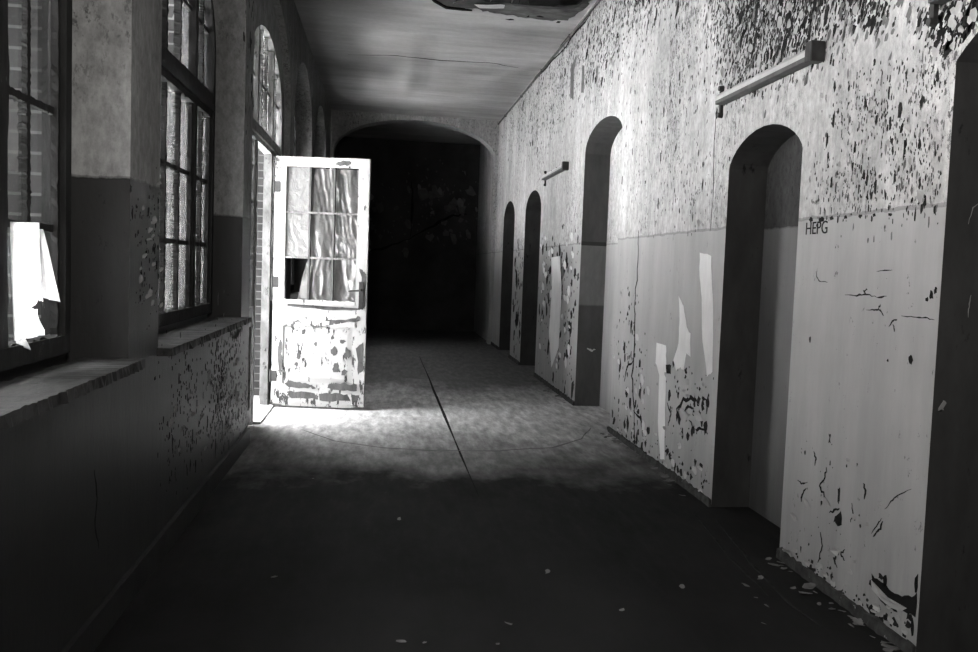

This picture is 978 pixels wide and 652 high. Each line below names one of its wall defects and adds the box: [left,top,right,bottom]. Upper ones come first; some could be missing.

peeling [432,0,978,241]
peeling [612,288,714,492]
peeling [782,448,918,638]